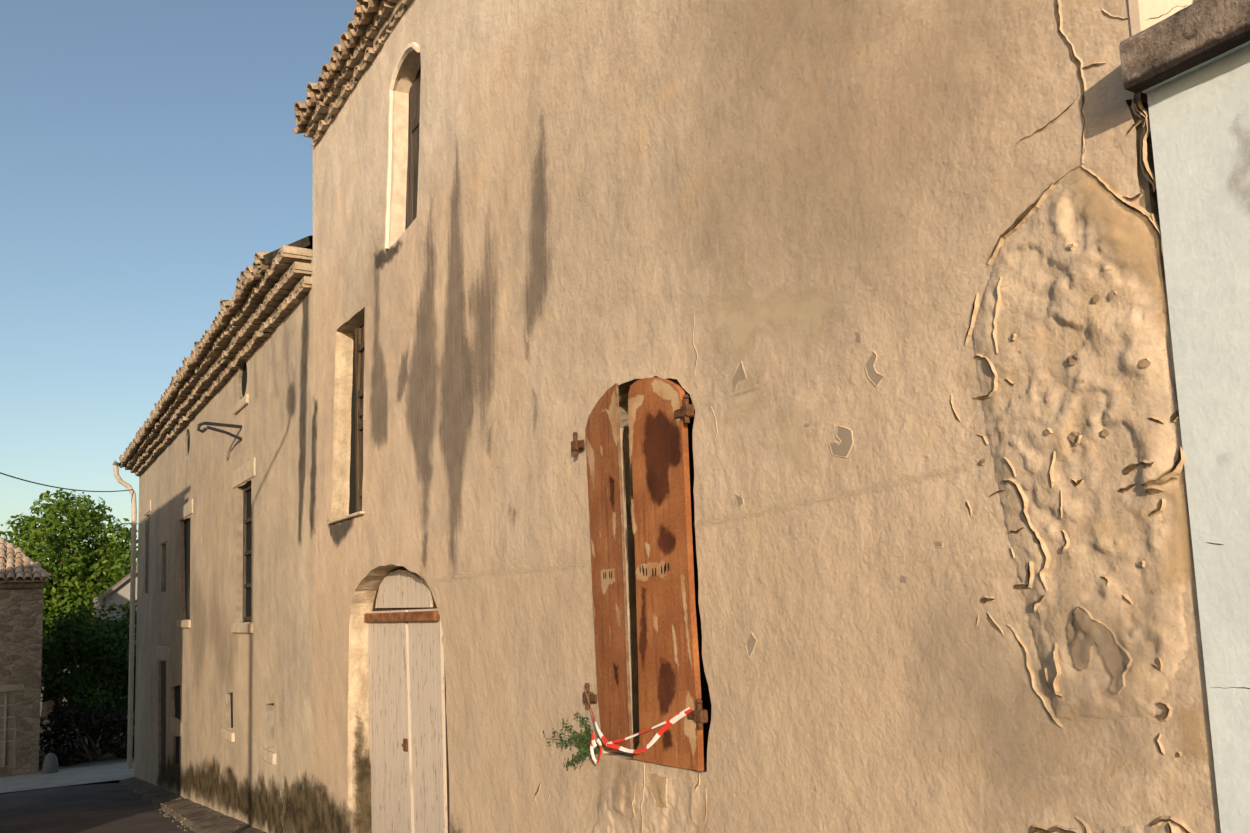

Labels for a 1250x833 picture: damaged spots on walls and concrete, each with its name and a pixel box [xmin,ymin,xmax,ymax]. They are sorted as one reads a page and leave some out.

crack [1101,5,1188,21]
leakage [371,149,494,569]
leakage [526,120,547,330]
crack [950,0,1169,729]